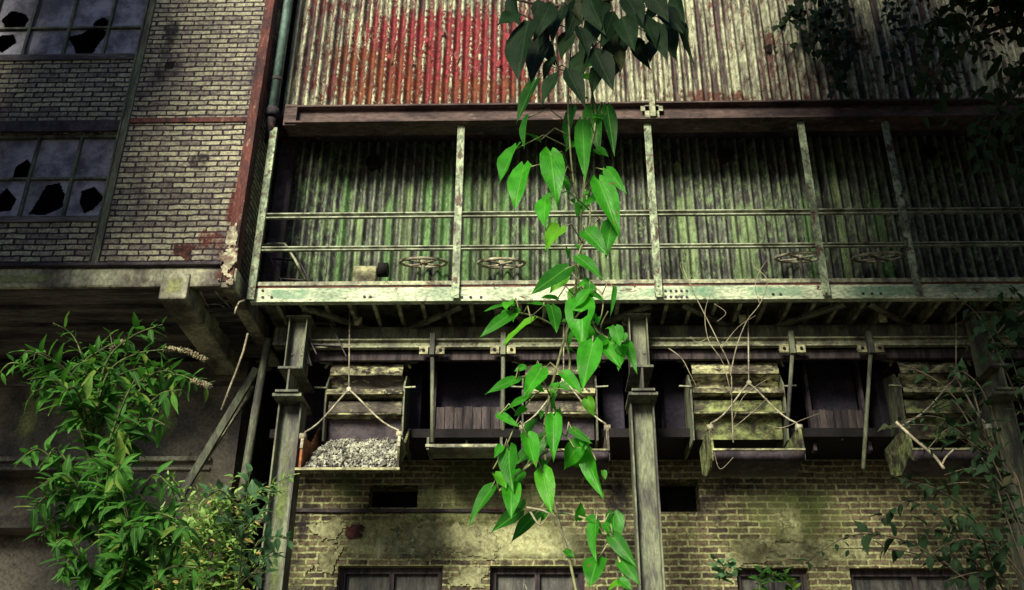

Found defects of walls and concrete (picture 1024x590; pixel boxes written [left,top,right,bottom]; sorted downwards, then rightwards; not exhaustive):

corrosion [294,32,571,105]
corrosion [643,90,769,101]
corrosion [226,183,235,222]
corrosion [199,230,223,251]
spalling [217,223,239,286]
flaking render [304,516,365,575]